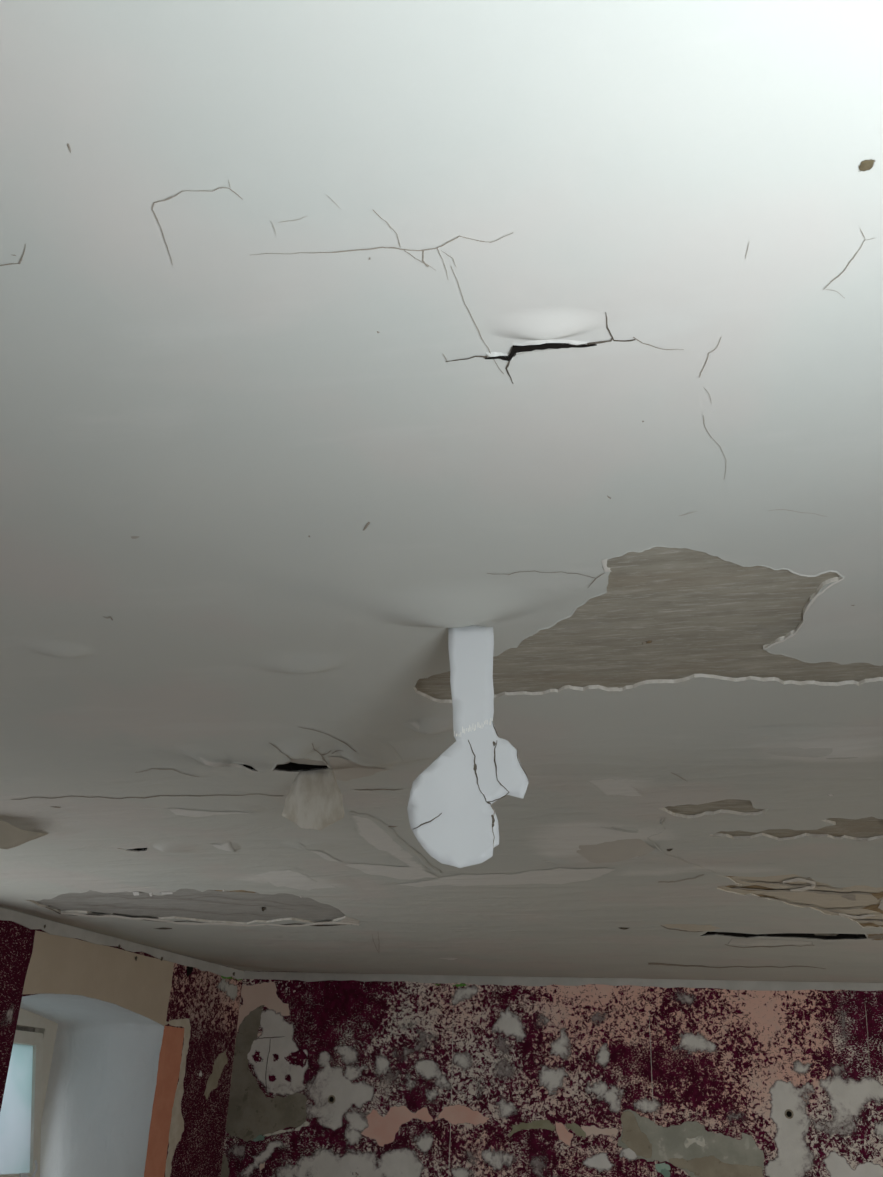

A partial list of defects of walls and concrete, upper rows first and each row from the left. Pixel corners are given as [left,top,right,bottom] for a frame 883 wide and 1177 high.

crack [152,180,243,265]
crack [257,210,726,478]
peeling [282,546,883,887]
peeling [0,820,49,849]
peeling [27,888,360,927]
peeling [716,874,883,928]
peeling [204,1005,309,1142]
peeling [617,1109,764,1177]